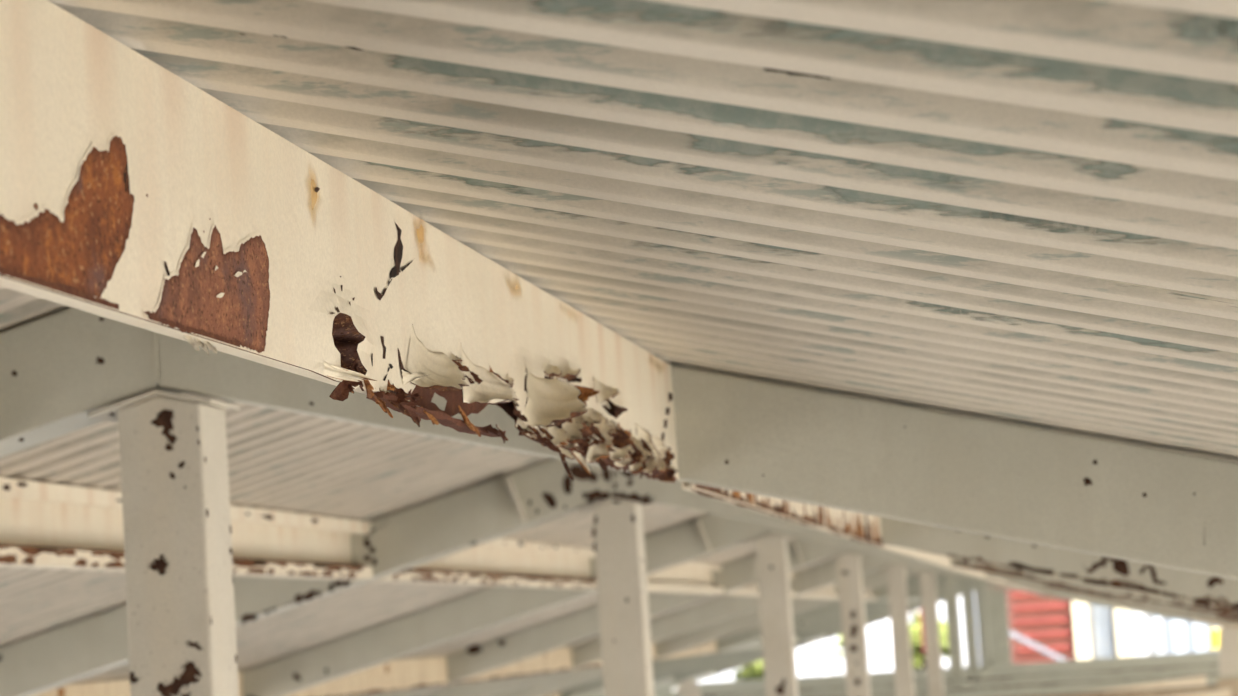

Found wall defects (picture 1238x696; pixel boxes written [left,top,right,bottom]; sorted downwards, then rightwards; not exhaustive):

corrosion [0,131,148,321]
corrosion [142,218,271,355]
peeling [323,324,677,482]